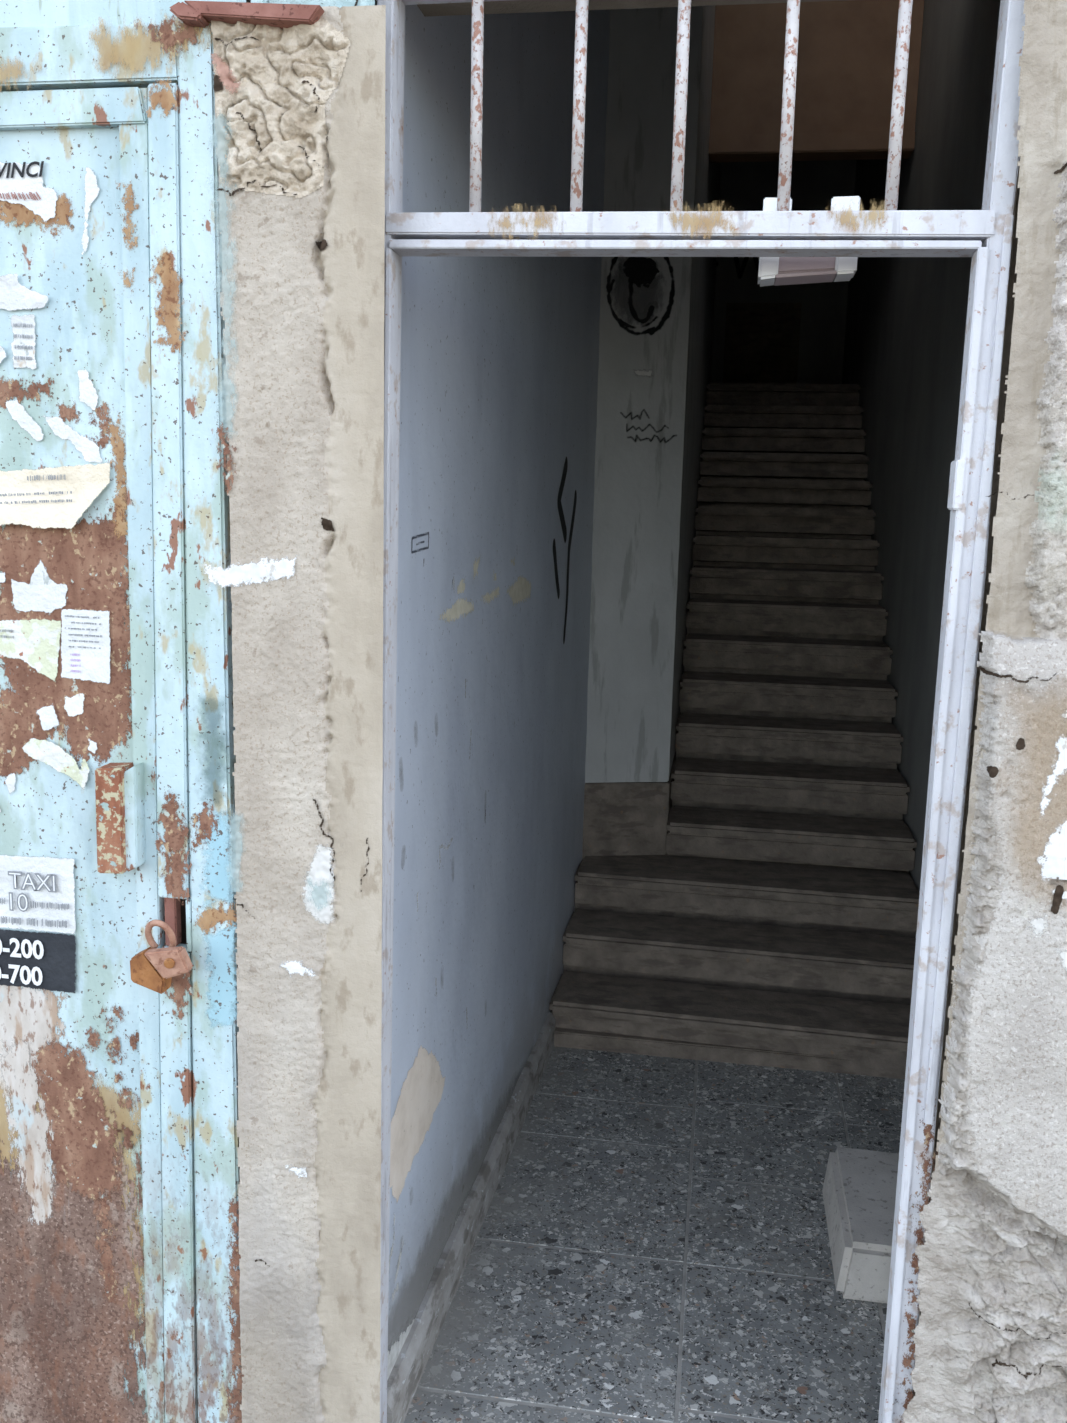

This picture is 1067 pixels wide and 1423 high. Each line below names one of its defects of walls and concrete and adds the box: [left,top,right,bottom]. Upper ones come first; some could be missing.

corrosion [0,59,33,91]
corrosion [91,15,212,118]
flaking render [211,15,351,198]
corrosion [116,180,186,365]
corrosion [492,206,552,238]
corrosion [671,206,735,238]
corrosion [831,204,884,230]
corrosion [0,376,132,784]
corrosion [0,1005,148,1423]
peeling [390,1046,445,1202]
corrosion [893,1109,936,1423]
spalling [902,739,1067,1423]